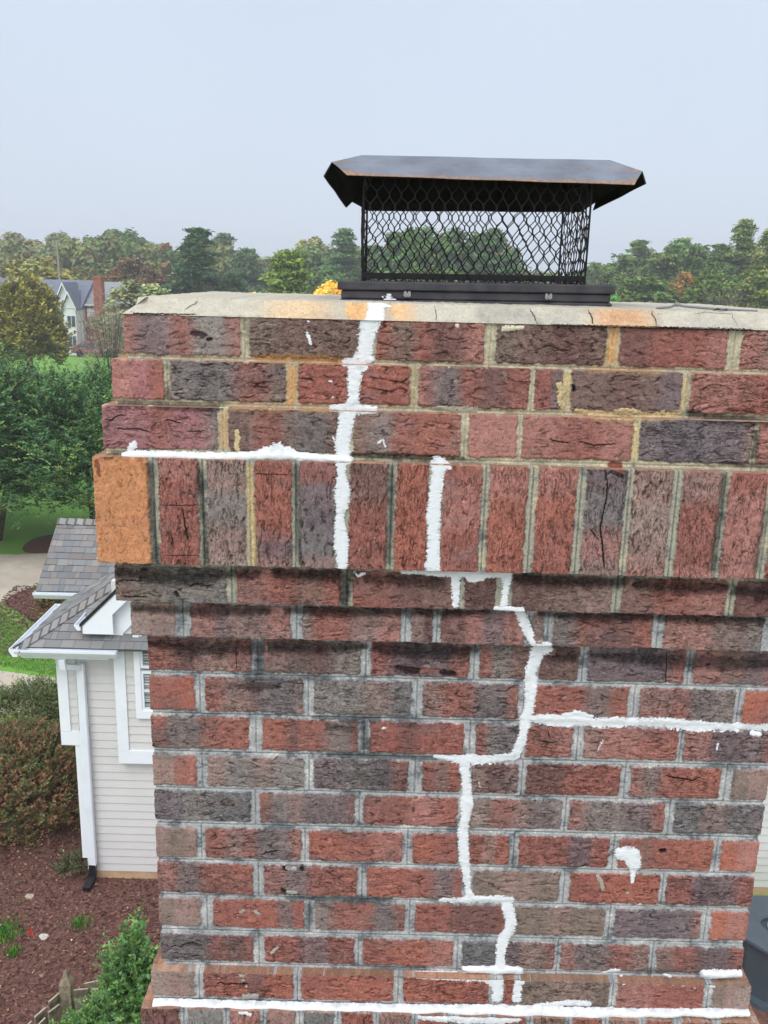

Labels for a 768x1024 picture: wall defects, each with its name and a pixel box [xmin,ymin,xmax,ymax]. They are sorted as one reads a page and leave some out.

crack [133,298,198,315]
crack [104,414,205,433]
crack [589,470,608,568]
crack [163,504,198,556]
crack [118,579,147,597]
crack [171,942,202,959]